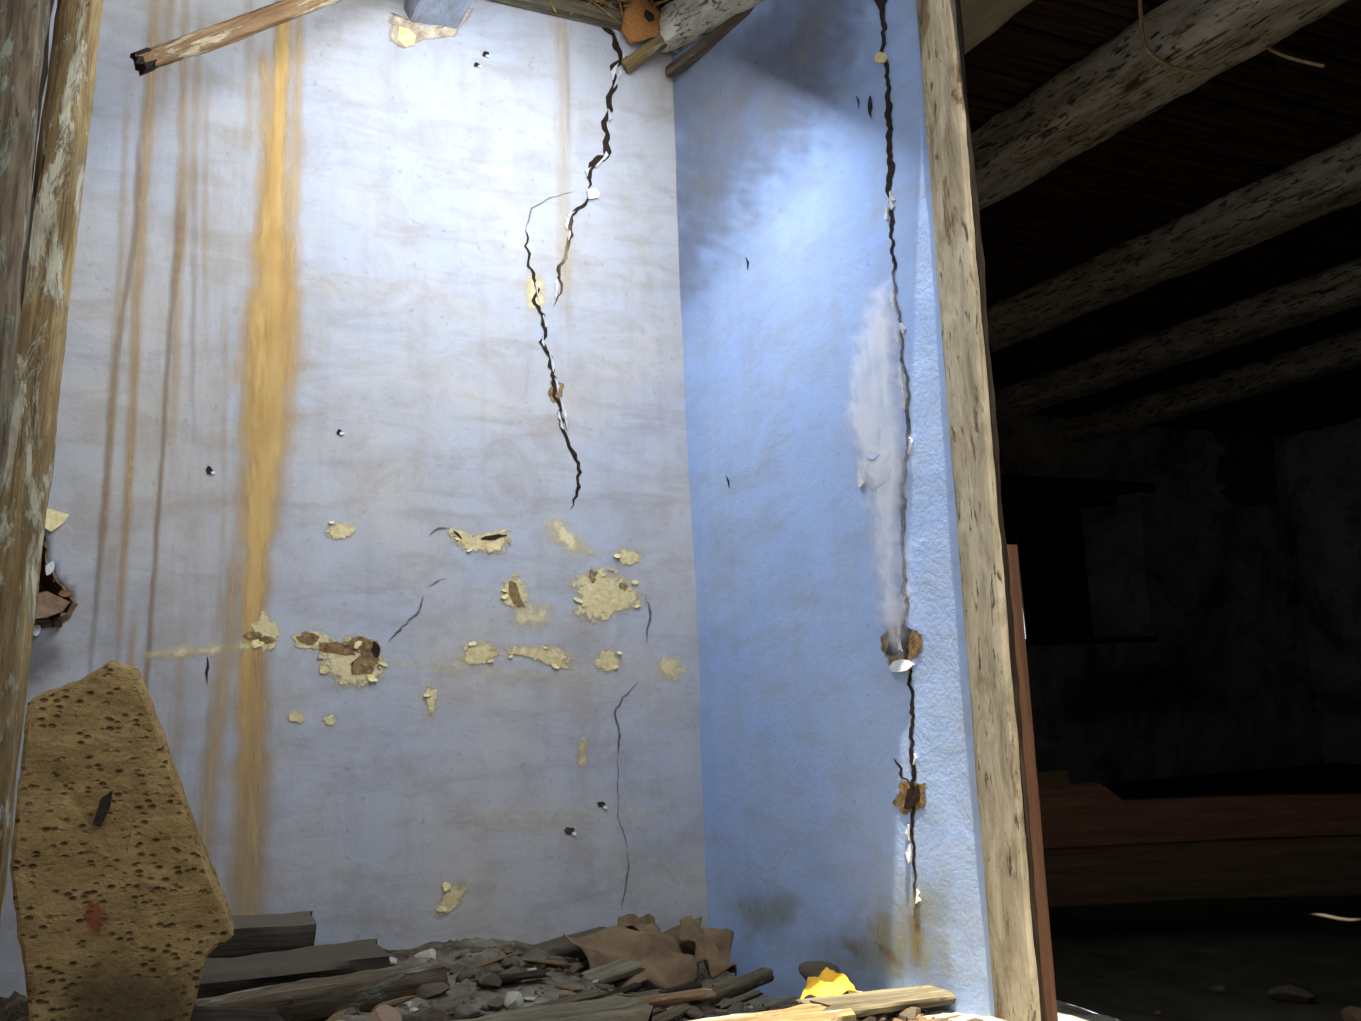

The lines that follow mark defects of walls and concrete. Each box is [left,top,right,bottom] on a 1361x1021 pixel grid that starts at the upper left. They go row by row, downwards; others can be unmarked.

water stain [171,209,181,323]
crack [524,27,627,508]
spalling [33,508,78,636]
water stain [156,436,165,559]
corrosion [202,21,300,915]
peeling [448,527,512,554]
peeling [553,521,648,623]
crack [868,0,926,921]
peeling [240,610,388,688]
peeling [461,640,574,669]
crack [614,681,638,906]